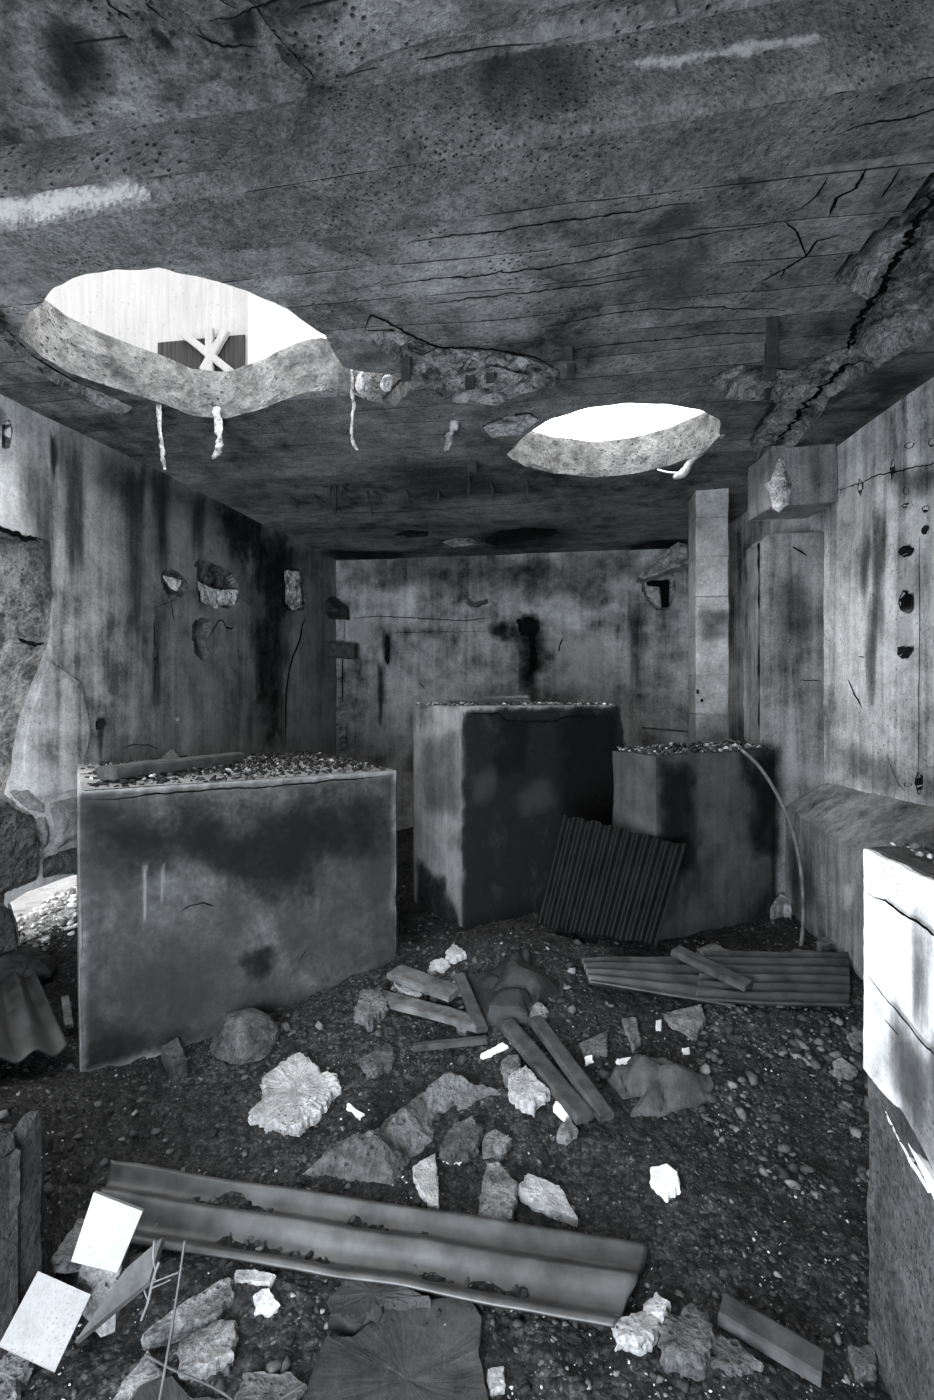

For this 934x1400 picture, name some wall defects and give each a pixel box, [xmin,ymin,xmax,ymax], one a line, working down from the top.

crack [106,0,278,49]
spalling [710,173,934,460]
spalling [0,312,132,416]
crack [838,462,934,492]
crack [0,526,40,543]
damp [492,616,539,641]
crack [870,894,934,936]